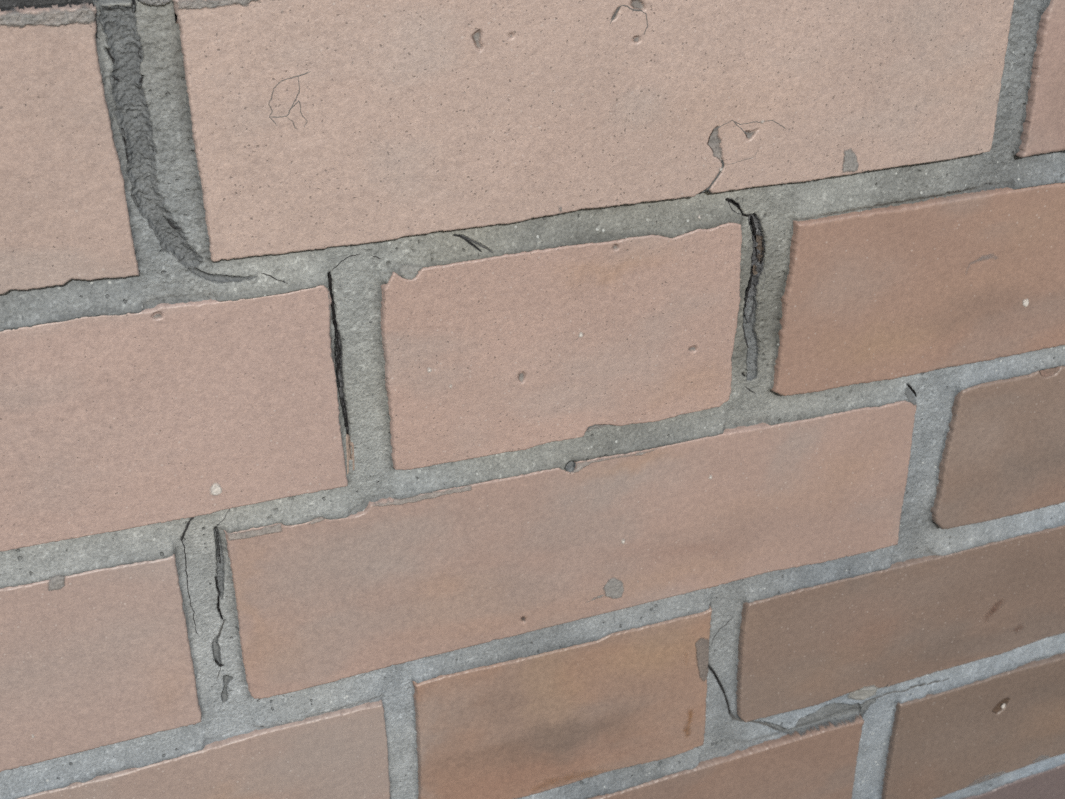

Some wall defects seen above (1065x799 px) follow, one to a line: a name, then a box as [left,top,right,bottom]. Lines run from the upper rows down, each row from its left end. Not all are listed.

spalling [700,120,785,193]
crack [328,254,381,474]
crack [726,198,766,394]
crack [181,509,233,703]
crack [708,617,777,730]